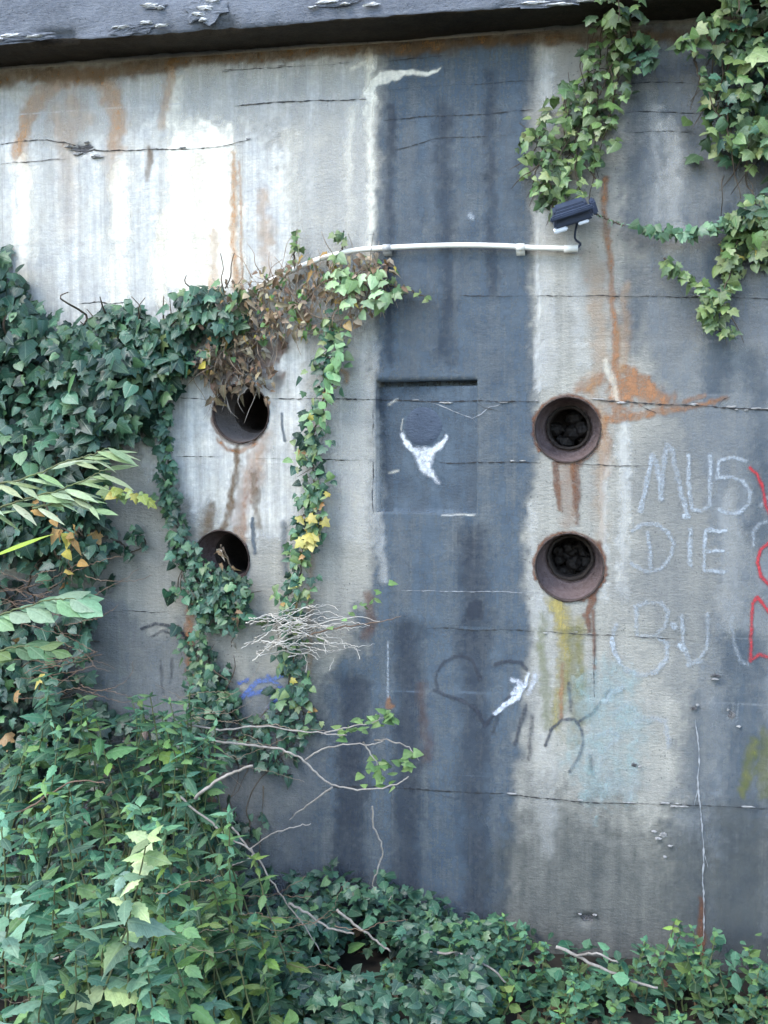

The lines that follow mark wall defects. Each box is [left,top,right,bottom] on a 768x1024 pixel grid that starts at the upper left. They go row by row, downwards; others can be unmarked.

spalling [0,32,56,42]
crack [2,138,251,164]
spalling [107,3,169,36]
spalling [184,0,229,26]
corrosion [0,30,690,155]
crack [239,80,538,106]
damp [0,54,319,554]
corrosion [532,236,720,452]
corrosion [206,417,257,530]
damp [198,23,768,973]
damp [54,595,200,814]
crack [333,719,764,939]